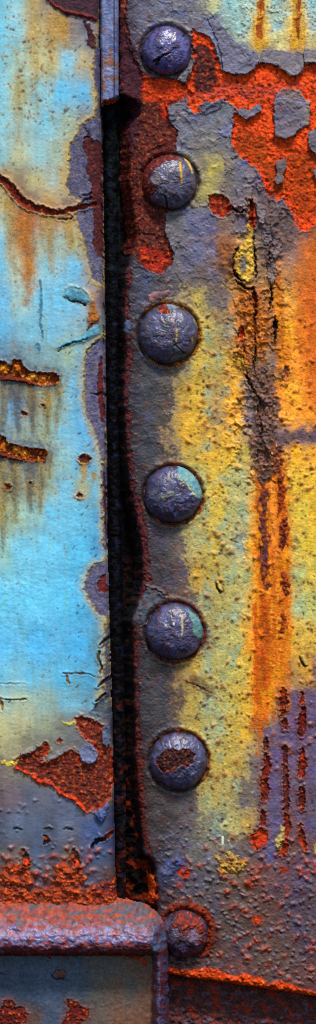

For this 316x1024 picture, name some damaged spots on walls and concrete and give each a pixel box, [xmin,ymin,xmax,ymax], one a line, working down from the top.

peeling [48,0,105,285]
peeling [119,0,316,274]
spalling [0,435,48,462]
spalling [0,359,59,386]
rust [122,268,205,607]
crack [237,251,278,397]
peeling [14,336,114,813]
rust [252,429,316,737]
rust [131,625,211,857]
rust [0,852,117,907]
rust [146,870,316,996]